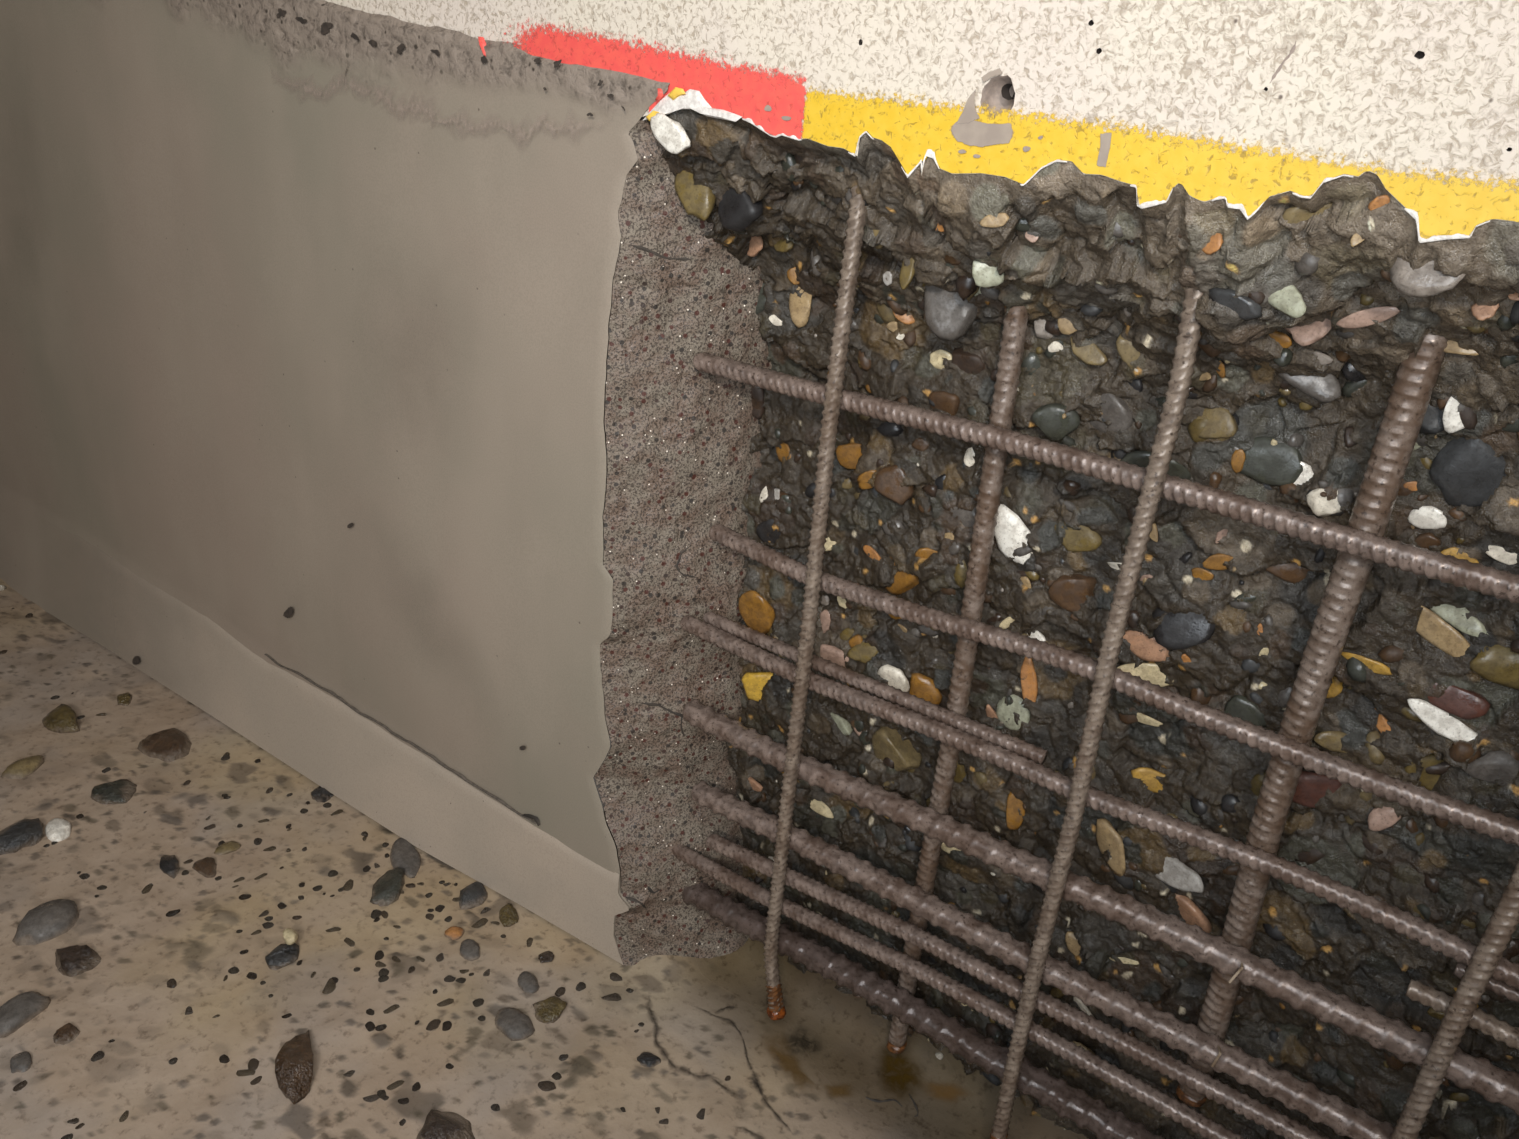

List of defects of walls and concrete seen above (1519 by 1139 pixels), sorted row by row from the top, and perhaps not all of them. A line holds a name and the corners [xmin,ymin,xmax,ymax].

crack [649,1007,787,1139]
spalling [620,68,1519,1139]